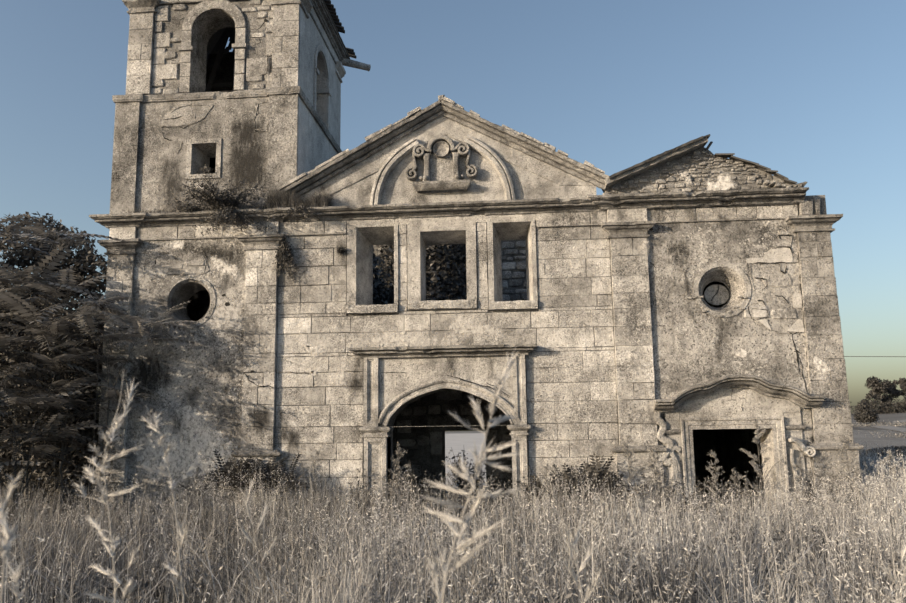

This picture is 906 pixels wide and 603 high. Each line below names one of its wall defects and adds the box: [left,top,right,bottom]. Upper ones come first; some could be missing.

damp [231,120,265,190]
flaking render [744,227,805,334]
damp [133,357,170,390]
crack [790,332,809,394]